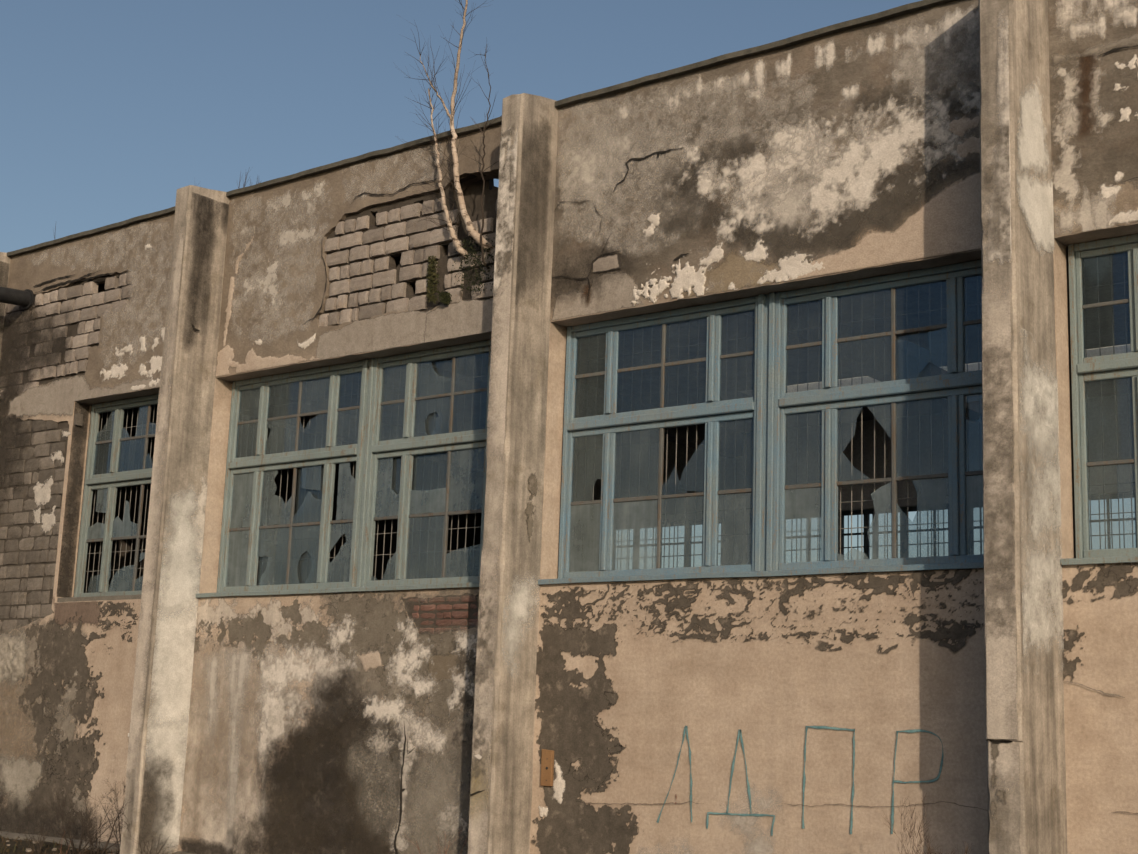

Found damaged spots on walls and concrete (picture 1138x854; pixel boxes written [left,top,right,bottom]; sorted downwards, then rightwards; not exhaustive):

crack [552,147,684,301]
peeling [740,240,812,284]
peeling [1098,172,1124,200]
peeling [316,292,494,360]
peeling [8,327,165,417]
spalling [531,350,1061,854]
peeling [1061,563,1138,604]
damp [448,568,483,759]
peeling [1062,625,1086,682]
damp [181,614,467,854]
damp [0,800,94,840]
crack [389,725,415,854]